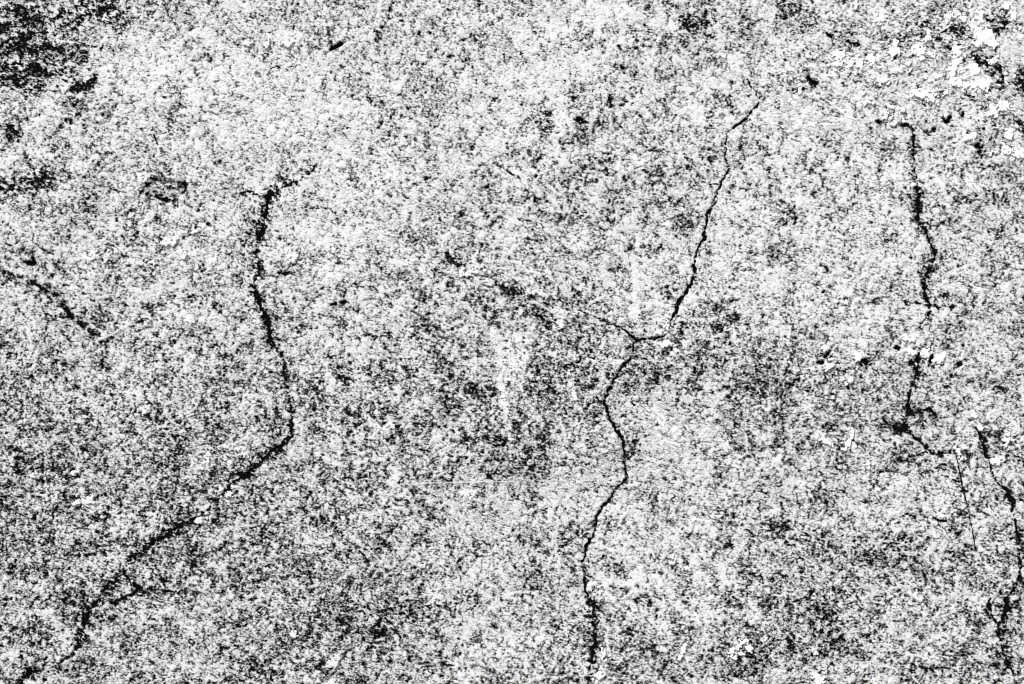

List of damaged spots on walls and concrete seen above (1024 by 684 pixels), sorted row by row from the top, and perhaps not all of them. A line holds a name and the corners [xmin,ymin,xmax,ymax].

crack [1,159,317,684]
crack [444,78,761,684]
crack [876,122,1024,684]